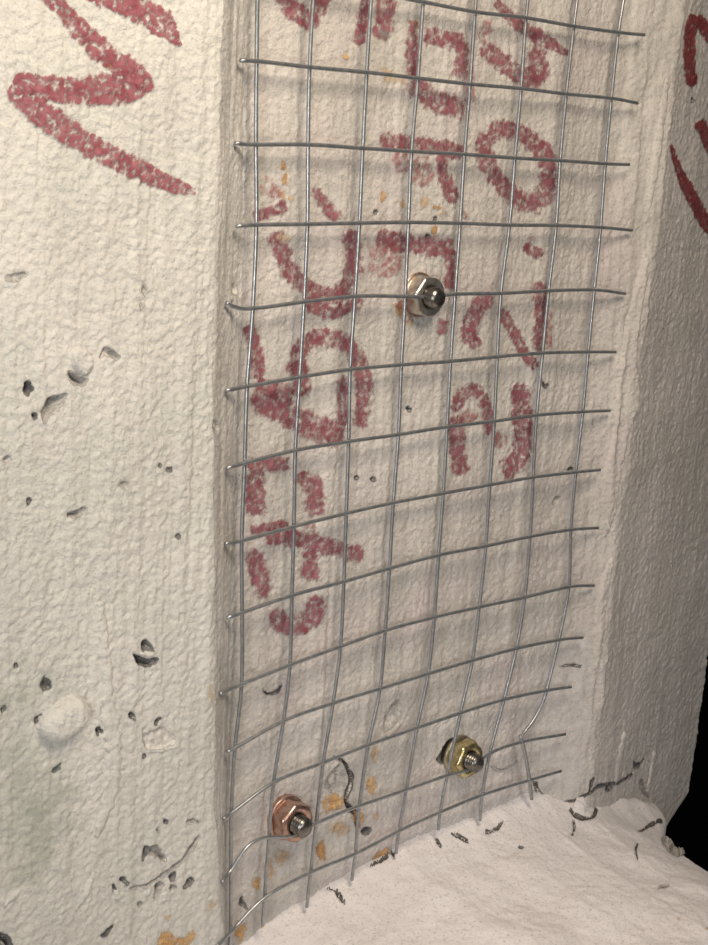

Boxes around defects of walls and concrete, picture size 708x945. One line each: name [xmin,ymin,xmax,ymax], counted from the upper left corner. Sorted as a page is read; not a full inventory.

corrosion [321,794,378,836]
corrosion [316,840,326,860]
corrosion [158,932,195,945]